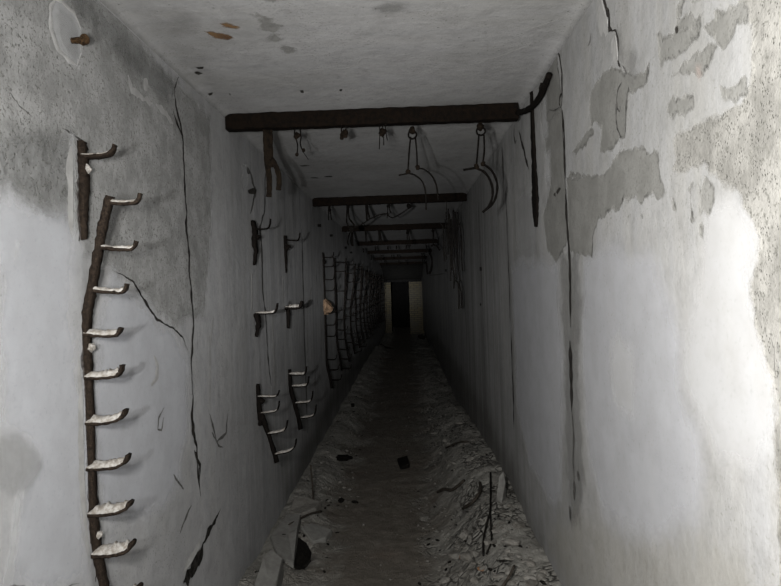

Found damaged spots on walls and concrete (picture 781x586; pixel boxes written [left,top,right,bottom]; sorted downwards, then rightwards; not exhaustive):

rust [207,23,238,40]
crack [588,0,627,138]
crack [502,132,529,224]
flaking render [541,57,676,262]
crack [117,75,228,533]
spalling [657,0,781,586]
crack [173,511,220,586]